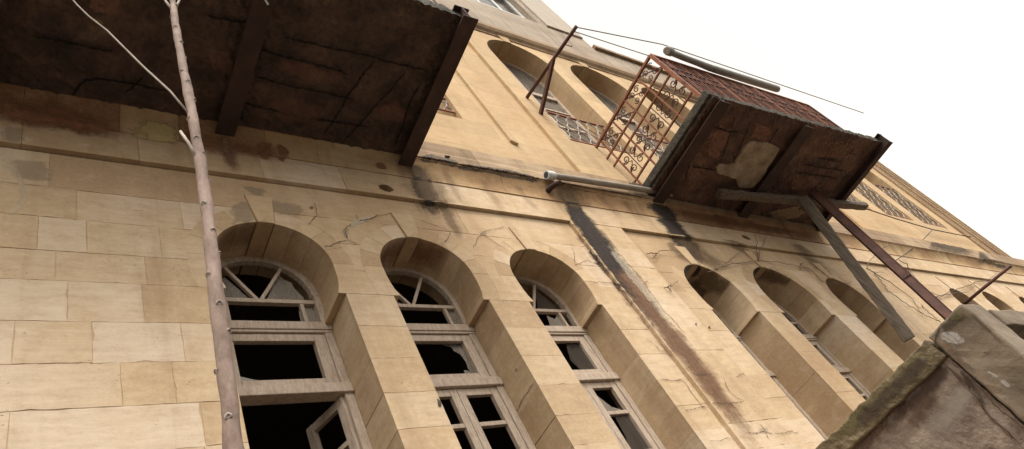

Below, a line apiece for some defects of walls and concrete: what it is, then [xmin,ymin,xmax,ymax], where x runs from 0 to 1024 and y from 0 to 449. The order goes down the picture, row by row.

damp [406,166,446,213]
crack [326,213,390,246]
damp [555,182,737,418]